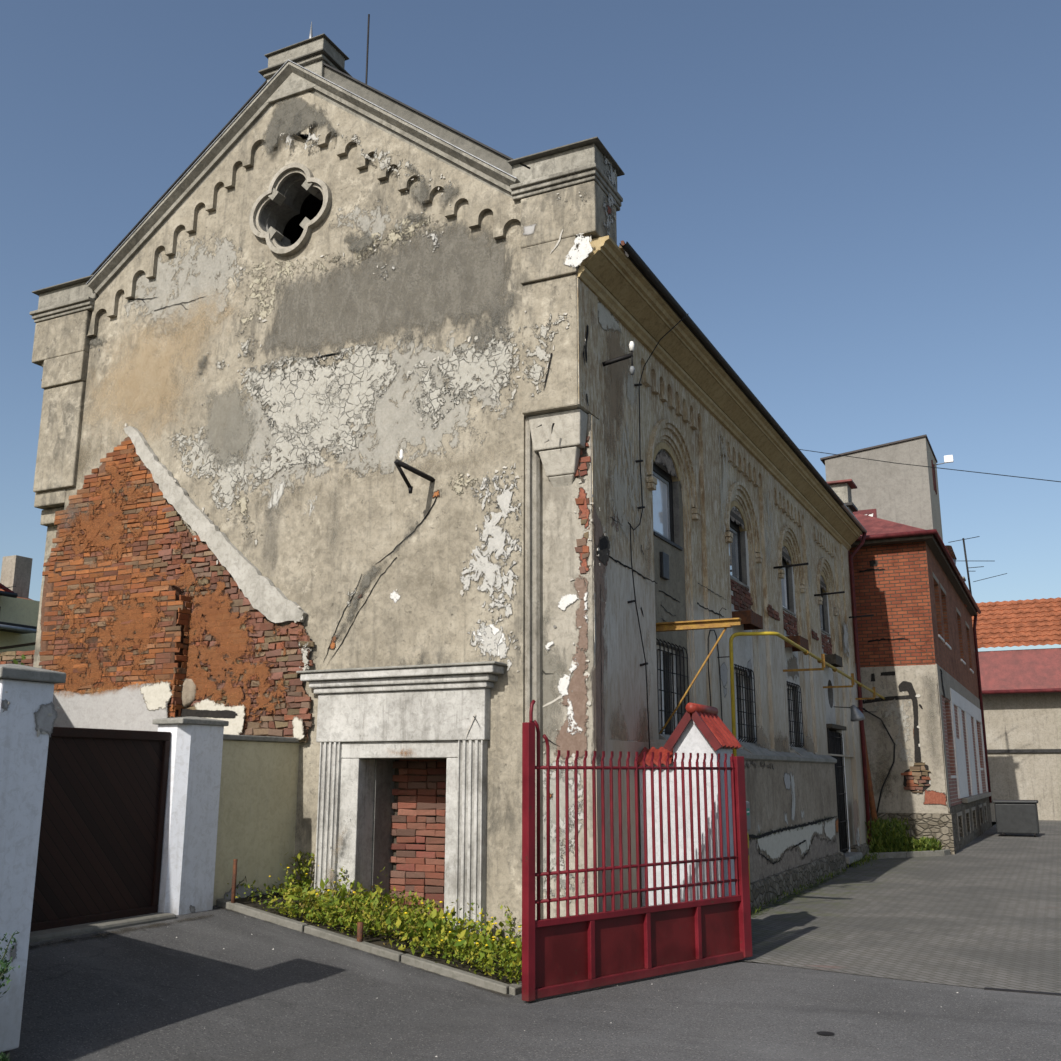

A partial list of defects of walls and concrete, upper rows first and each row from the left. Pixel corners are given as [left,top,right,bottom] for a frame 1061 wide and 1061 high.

spalling [563,233,593,267]
flaking render [34,199,569,743]
crack [323,497,437,665]
flaking render [767,604,780,621]
flaking render [543,424,648,903]
spalling [901,761,947,806]
spalling [749,819,838,883]